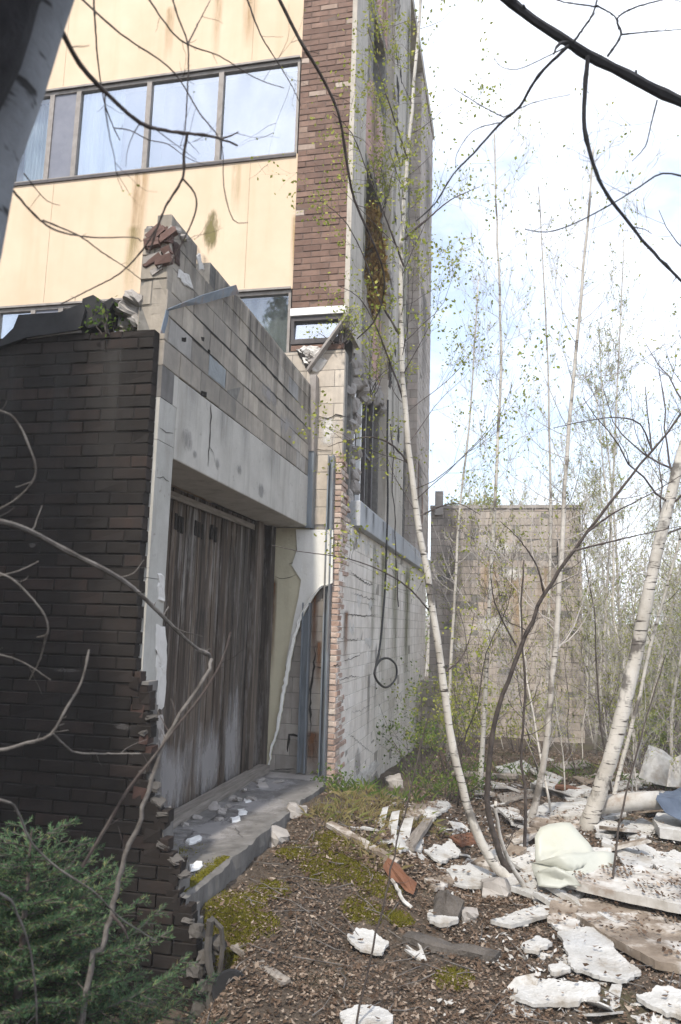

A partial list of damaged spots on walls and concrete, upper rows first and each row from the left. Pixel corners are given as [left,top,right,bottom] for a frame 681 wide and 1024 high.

peeling [366,0,402,184]
spalling [143,223,204,289]
leakage [204,212,217,247]
peeling [267,271,408,788]
peeling [157,573,165,603]
spalling [129,624,227,1023]
peeling [230,798,251,823]